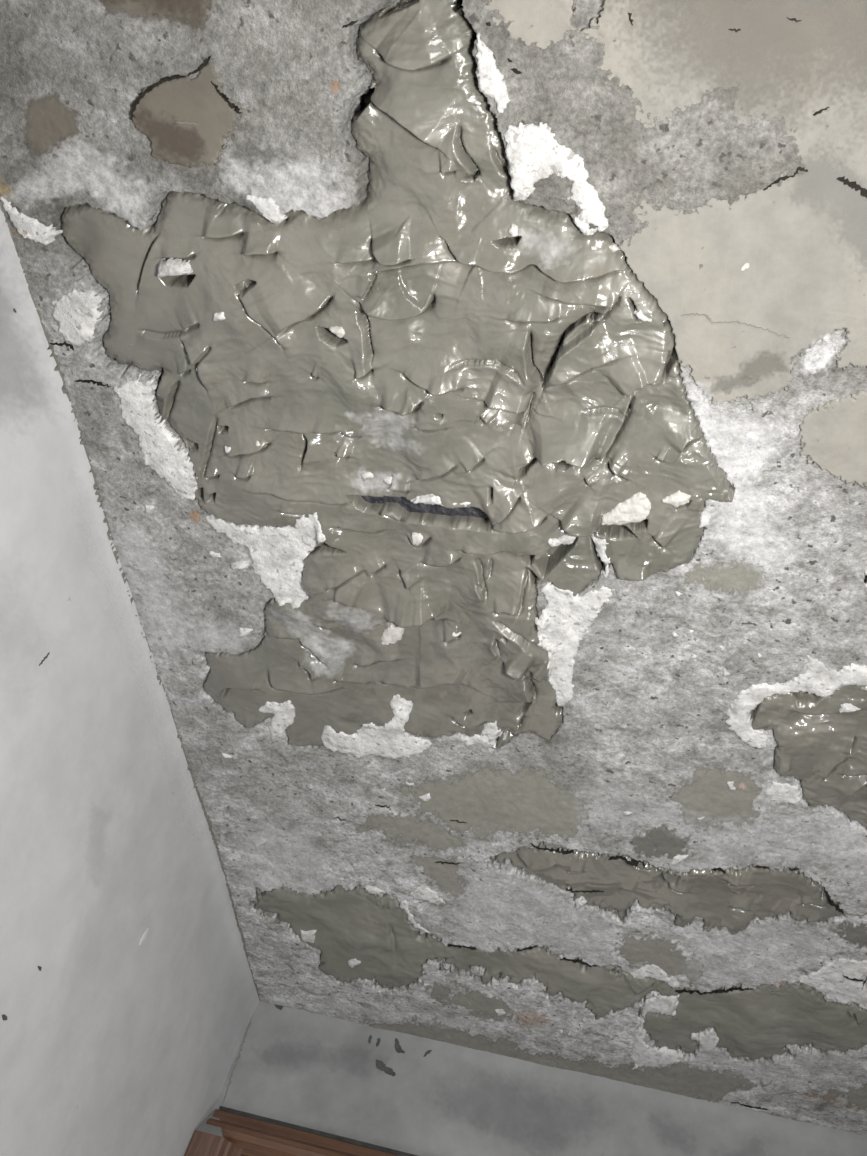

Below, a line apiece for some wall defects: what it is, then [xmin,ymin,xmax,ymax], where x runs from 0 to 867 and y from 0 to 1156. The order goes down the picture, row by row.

spalling [462,0,805,246]
crack [763,167,808,191]
crack [836,176,867,198]
spalling [0,0,400,713]
spalling [171,328,867,1135]
crack [531,843,574,854]
crack [608,856,646,867]
crack [755,864,799,872]
crack [566,886,604,894]